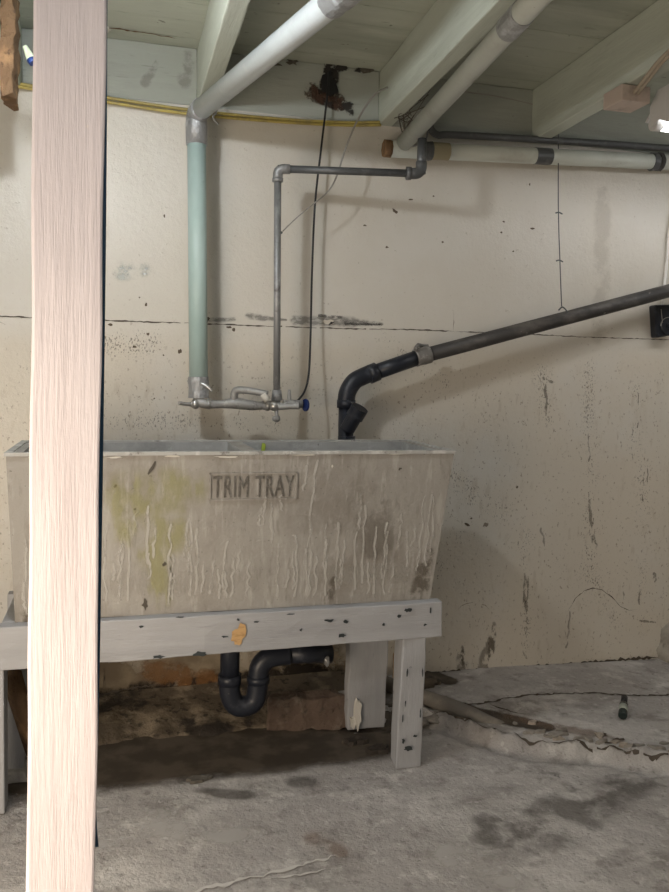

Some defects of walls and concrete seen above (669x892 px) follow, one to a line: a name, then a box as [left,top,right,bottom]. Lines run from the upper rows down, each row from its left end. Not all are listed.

rust [305,83,345,111]
crack [105,317,179,325]
crack [207,322,484,333]
crack [531,333,669,341]
crack [565,588,636,635]
crack [524,656,658,666]
crack [429,692,669,761]